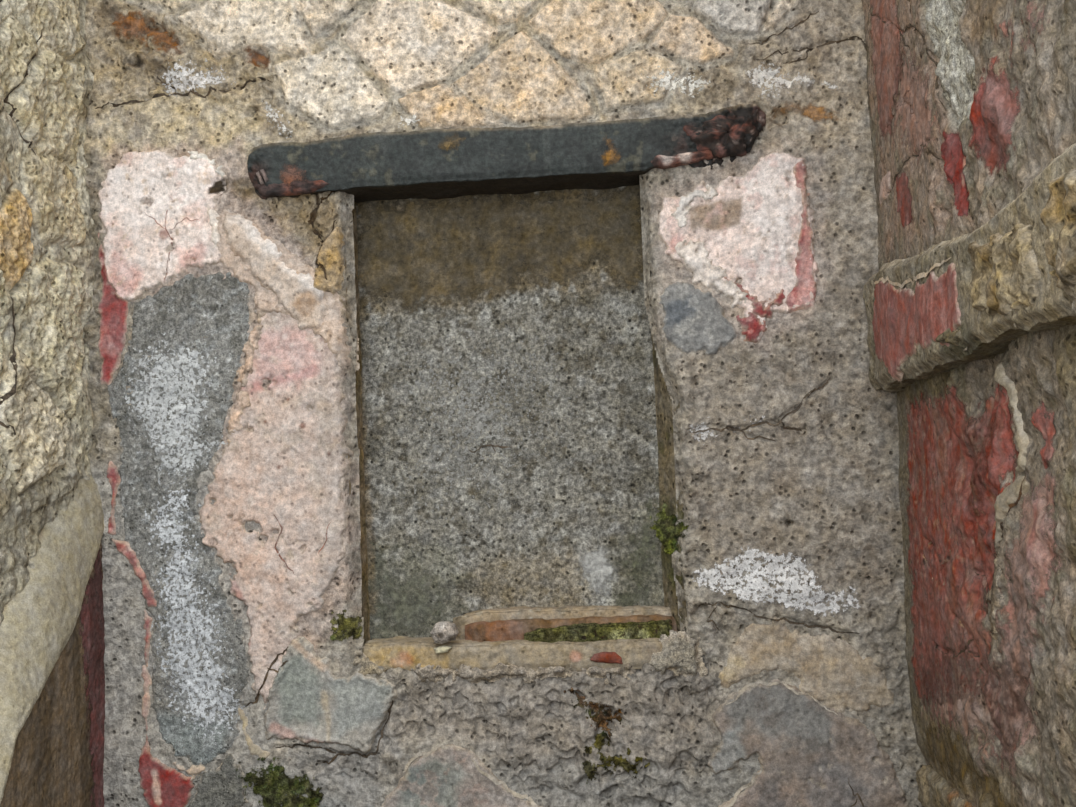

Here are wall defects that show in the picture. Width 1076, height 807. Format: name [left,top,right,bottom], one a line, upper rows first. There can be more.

crack [2,32,42,155]
crack [743,0,946,135]
crack [888,139,945,193]
crack [0,297,18,435]
crack [688,379,830,441]
peeling [872,257,961,382]
leakage [692,545,861,618]
peeling [907,362,1063,795]